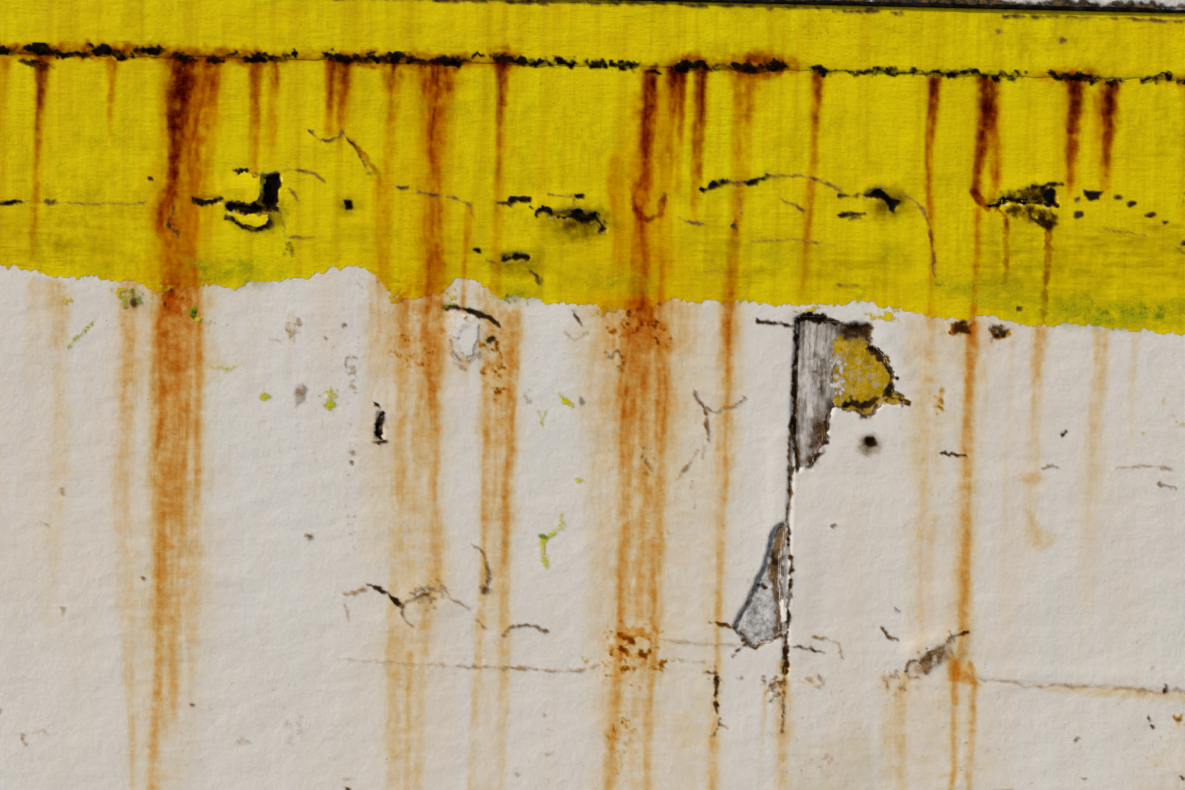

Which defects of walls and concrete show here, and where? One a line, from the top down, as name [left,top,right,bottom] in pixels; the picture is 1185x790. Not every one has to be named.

corrosion [157,54,219,248]
corrosion [607,63,710,344]
corrosion [969,74,998,220]
corrosion [1064,78,1085,184]
corrosion [1099,78,1119,176]
corrosion [948,309,975,336]
spalling [788,311,911,470]
crack [343,546,491,626]
crack [482,624,548,636]
crack [706,621,748,726]
spalling [733,522,788,649]
crack [762,430,841,733]